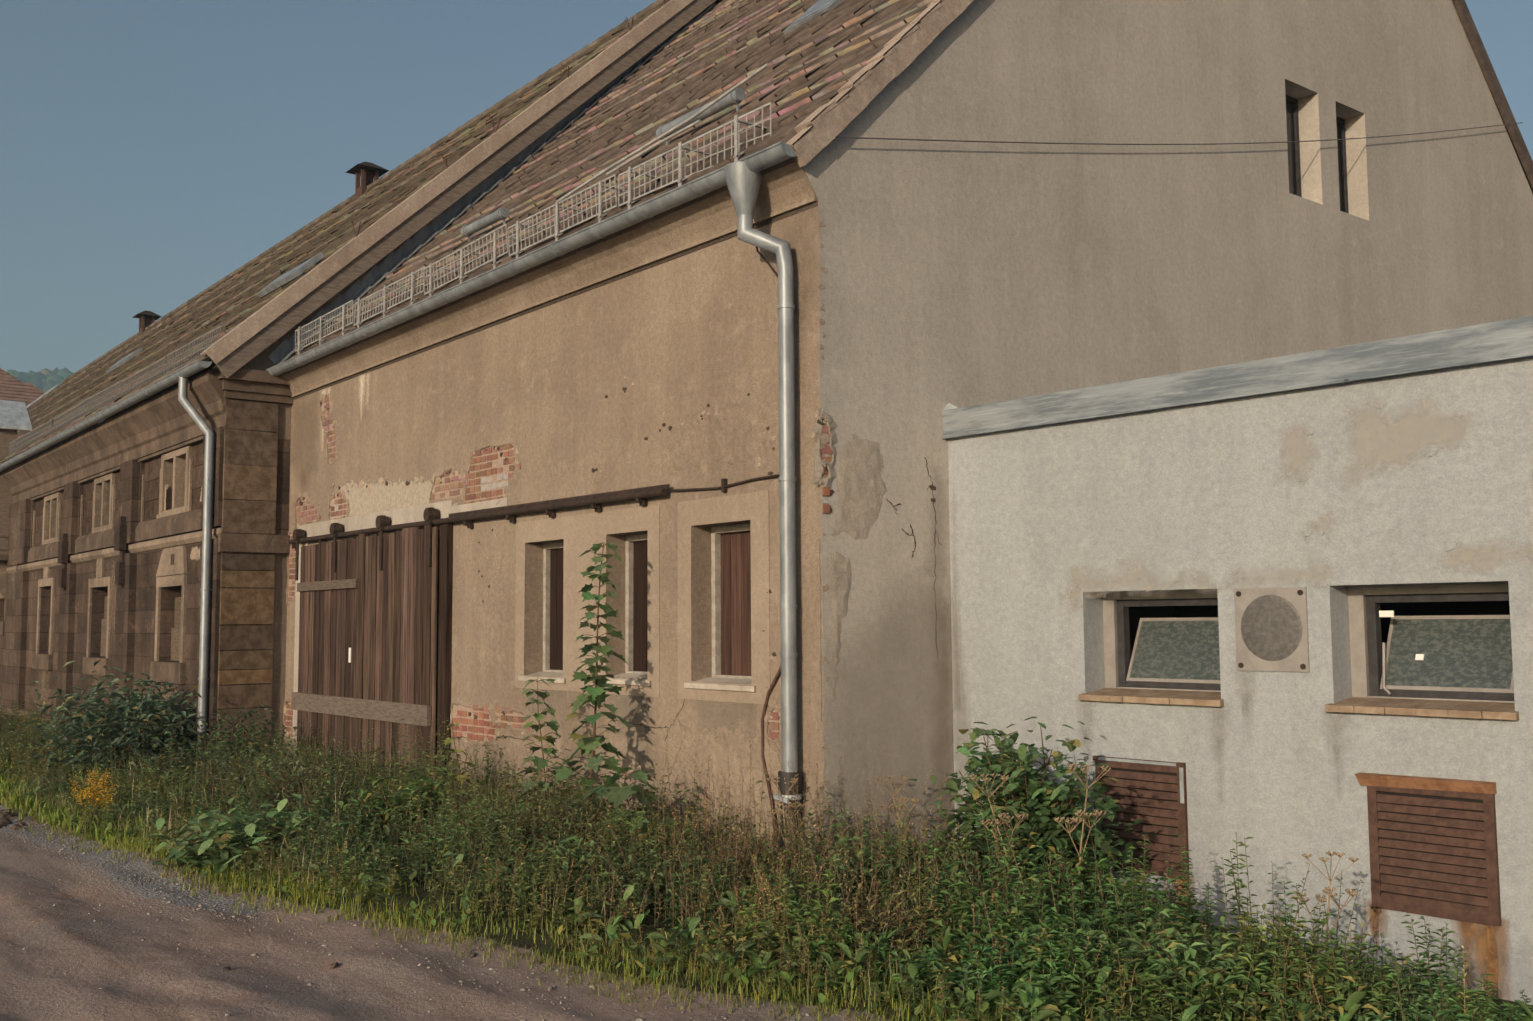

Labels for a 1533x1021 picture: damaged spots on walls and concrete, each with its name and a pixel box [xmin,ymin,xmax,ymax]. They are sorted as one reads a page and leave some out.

flaking render [318,392,340,465]
flaking render [811,408,838,514]
flaking render [286,436,521,606]
flaking render [450,694,538,751]
corrosion [1461,921,1505,998]